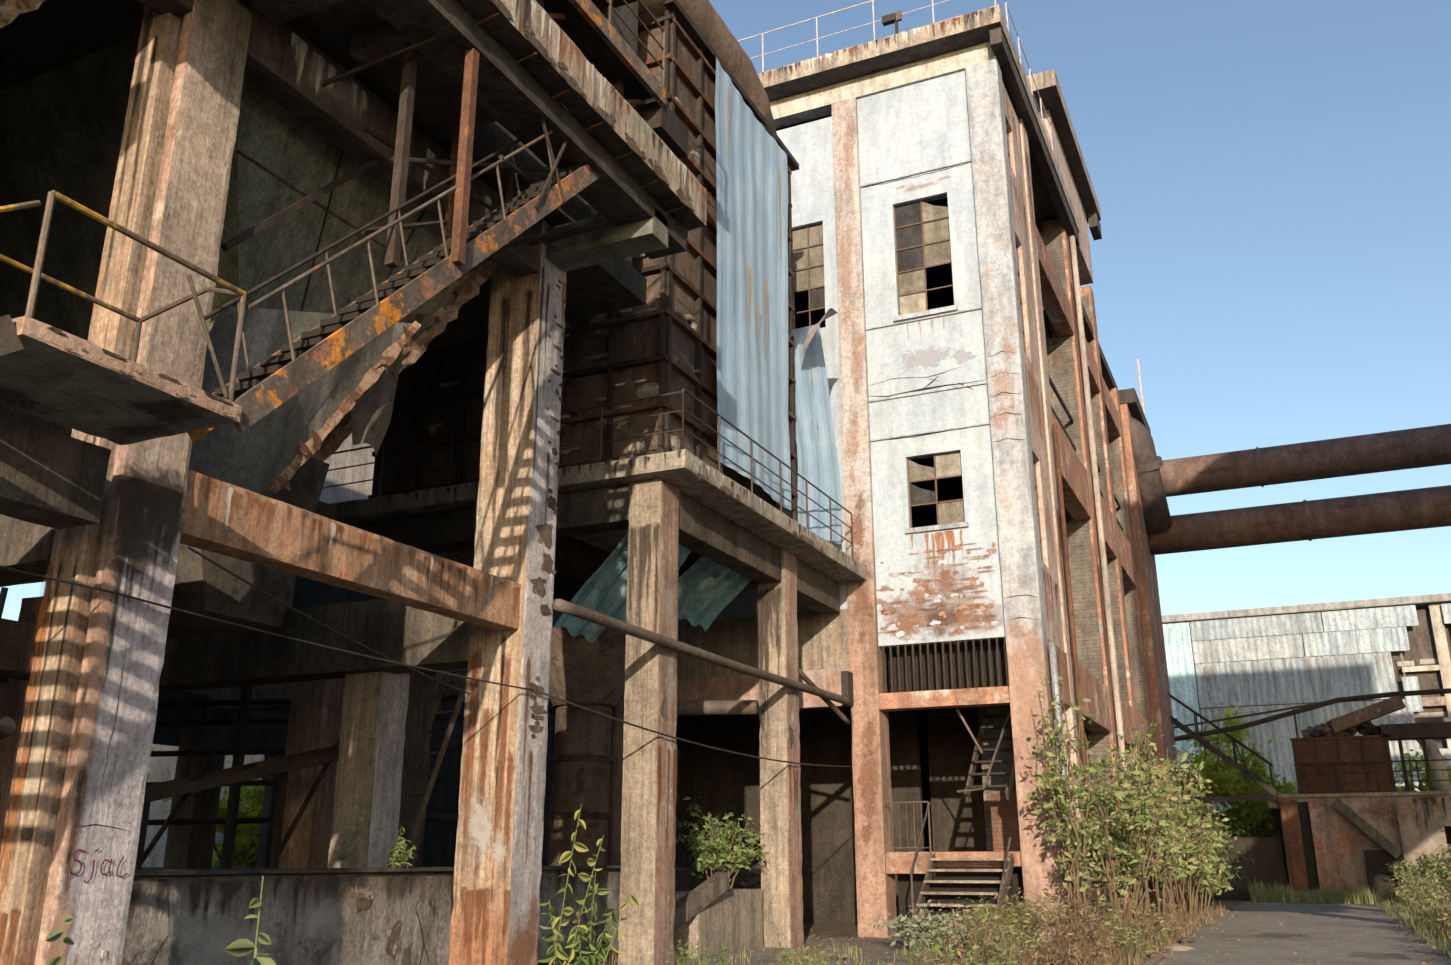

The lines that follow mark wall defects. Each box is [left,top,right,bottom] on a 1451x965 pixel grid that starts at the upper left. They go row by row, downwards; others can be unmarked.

corrosion [561,35,581,72]
corrosion [377,313,427,374]
corrosion [446,262,483,296]
corrosion [298,410,351,453]
water stain [106,468,183,678]
corrosion [205,478,518,615]
peeling [850,495,1002,642]
corrosion [0,564,52,952]
corrosion [62,759,87,893]
corrosion [461,651,538,965]